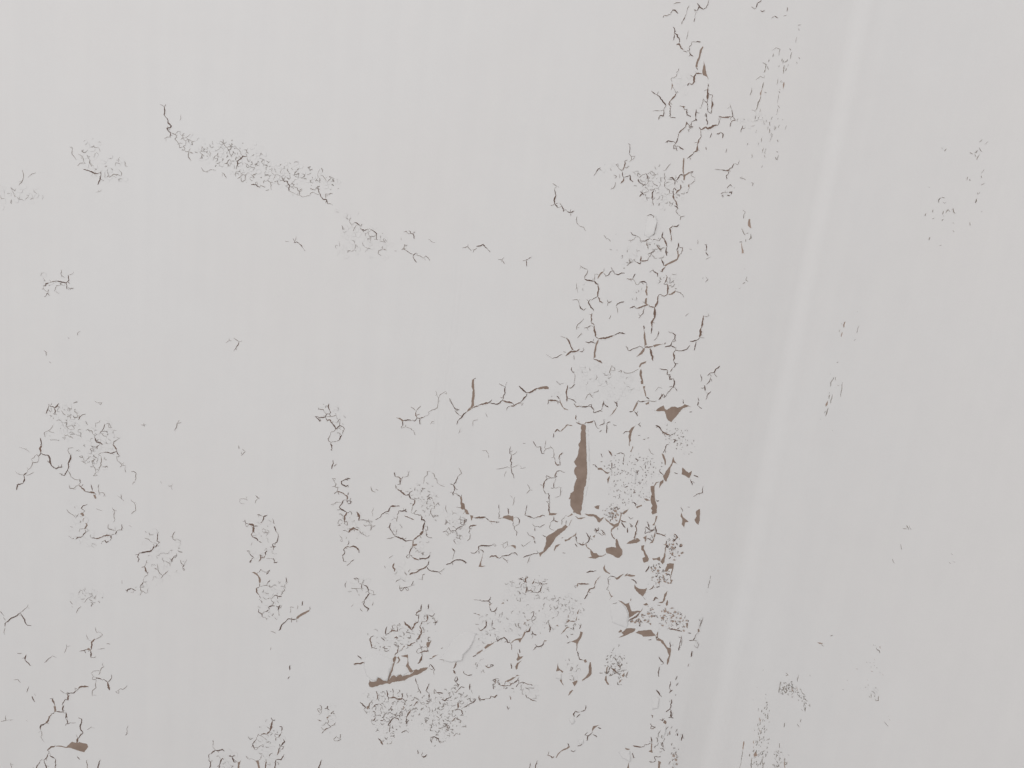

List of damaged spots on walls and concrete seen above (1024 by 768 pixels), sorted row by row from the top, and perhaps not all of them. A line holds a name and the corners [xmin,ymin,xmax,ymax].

crack [160,104,435,263]
crack [546,0,754,522]
crack [395,391,447,435]
crack [0,400,187,768]
crack [239,495,289,620]
peeling [353,604,445,689]
crack [314,403,702,768]
peeling [510,649,524,671]
peeling [449,361,704,665]
peeling [570,630,593,682]
peeling [46,717,95,754]
crack [207,717,291,768]